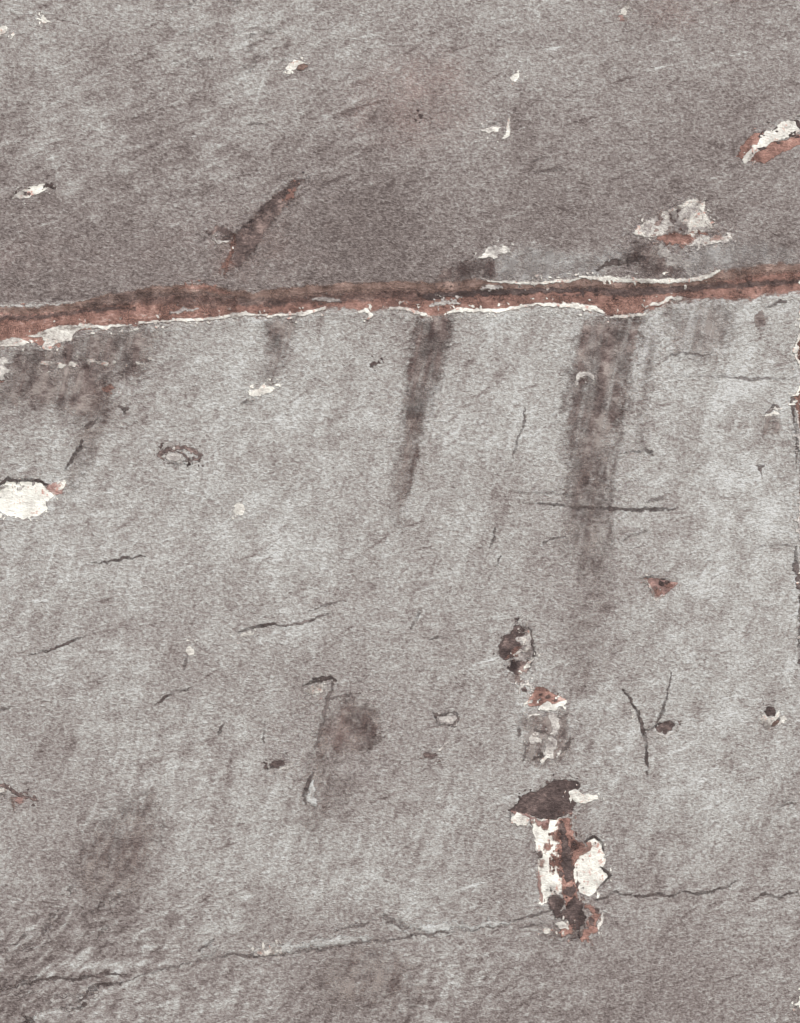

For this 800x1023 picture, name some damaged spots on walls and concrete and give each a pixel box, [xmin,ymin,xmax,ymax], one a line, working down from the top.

spalling [736,119,800,165]
peeling [0,293,340,383]
corrosion [0,262,800,335]
peeling [358,199,737,323]
leakage [396,312,456,515]
leakage [563,315,644,523]
spalling [0,476,67,521]
crack [622,673,672,772]
spalling [493,618,612,945]
crack [516,910,551,927]
crack [597,882,734,900]
crack [755,890,799,898]